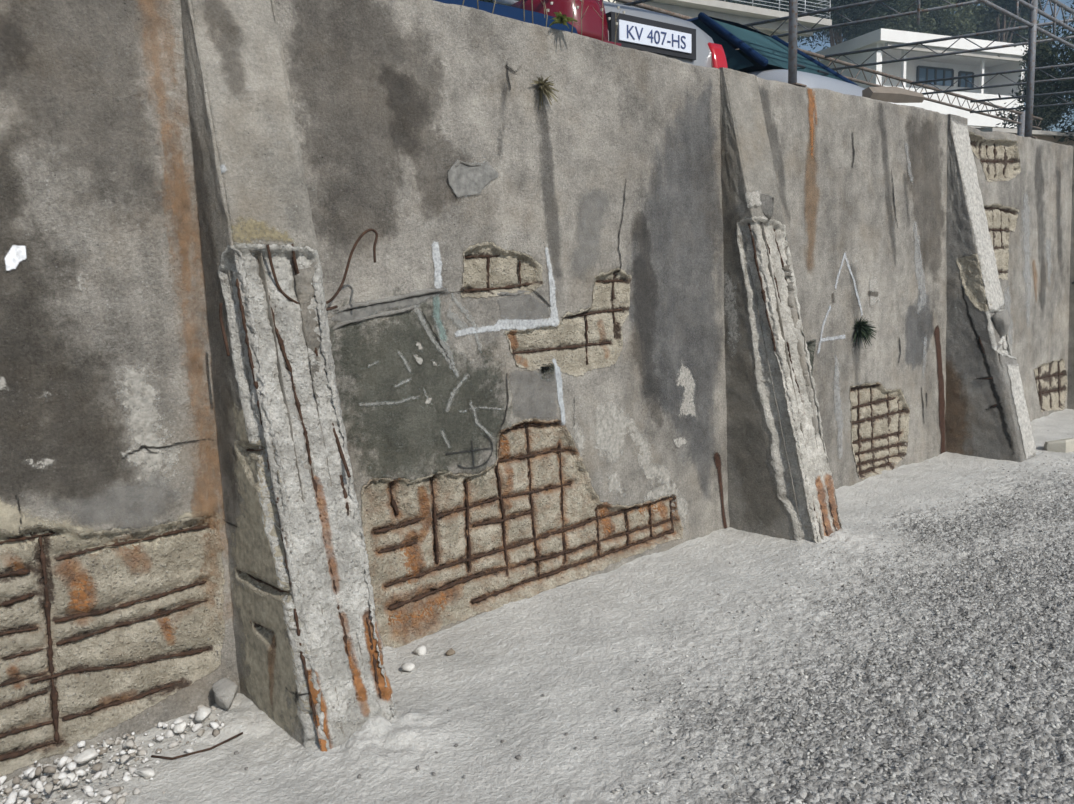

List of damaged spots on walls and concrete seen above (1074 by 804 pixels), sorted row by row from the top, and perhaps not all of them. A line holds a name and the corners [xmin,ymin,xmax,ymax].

rust [805,88,819,269]
water stain [118,366,175,485]
spalling [0,228,688,777]
spalling [724,191,843,543]
spalling [850,382,910,479]
crack [961,287,1014,454]
peeling [952,121,1068,458]